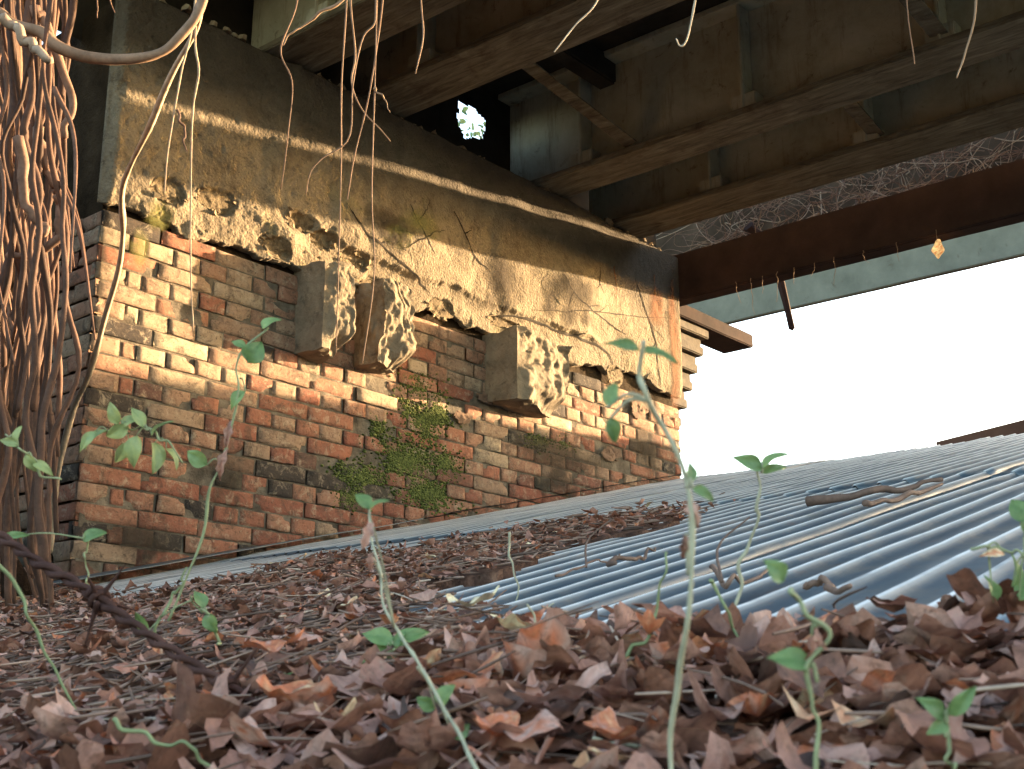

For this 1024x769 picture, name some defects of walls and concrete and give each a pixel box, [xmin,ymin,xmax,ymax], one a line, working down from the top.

spalling [150,176,237,216]
spalling [260,234,294,259]
spalling [285,206,373,288]
spalling [425,297,455,322]
spalling [487,314,522,329]
rust [652,275,680,398]
spalling [607,365,623,387]
leakage [321,430,478,520]